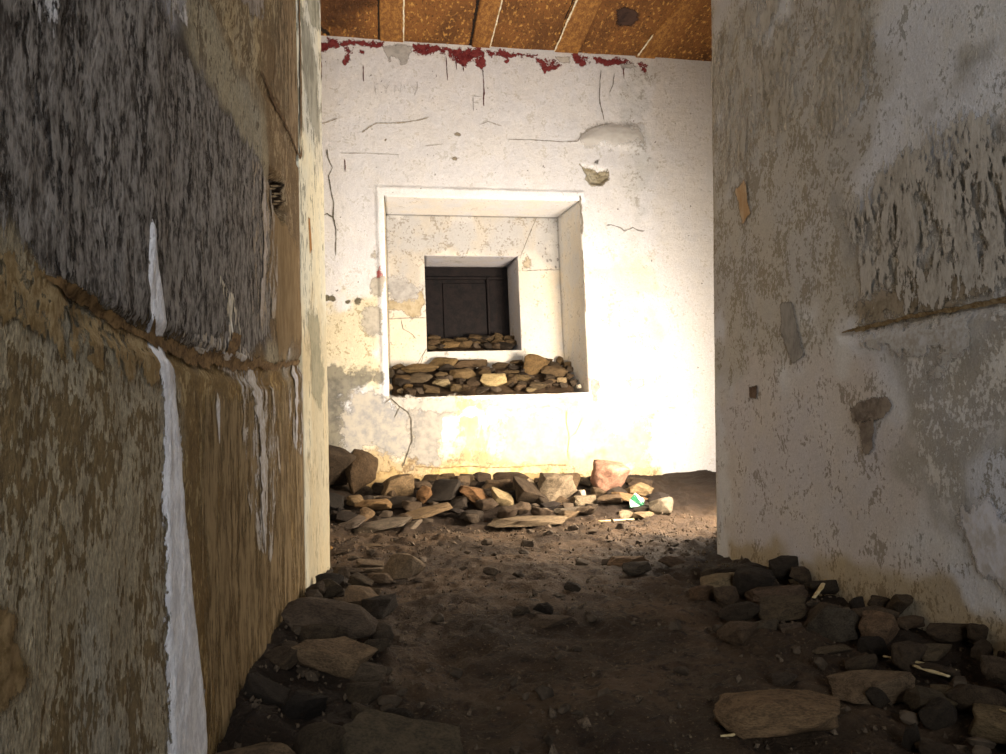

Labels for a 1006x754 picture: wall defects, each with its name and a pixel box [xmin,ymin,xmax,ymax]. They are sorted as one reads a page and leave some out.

crack [261,0,338,168]
peeling [242,0,648,151]
crack [324,117,429,254]
spalling [579,160,609,186]
crack [44,275,300,373]
crack [842,296,1006,333]
water stain [146,159,564,754]
crack [385,397,582,469]